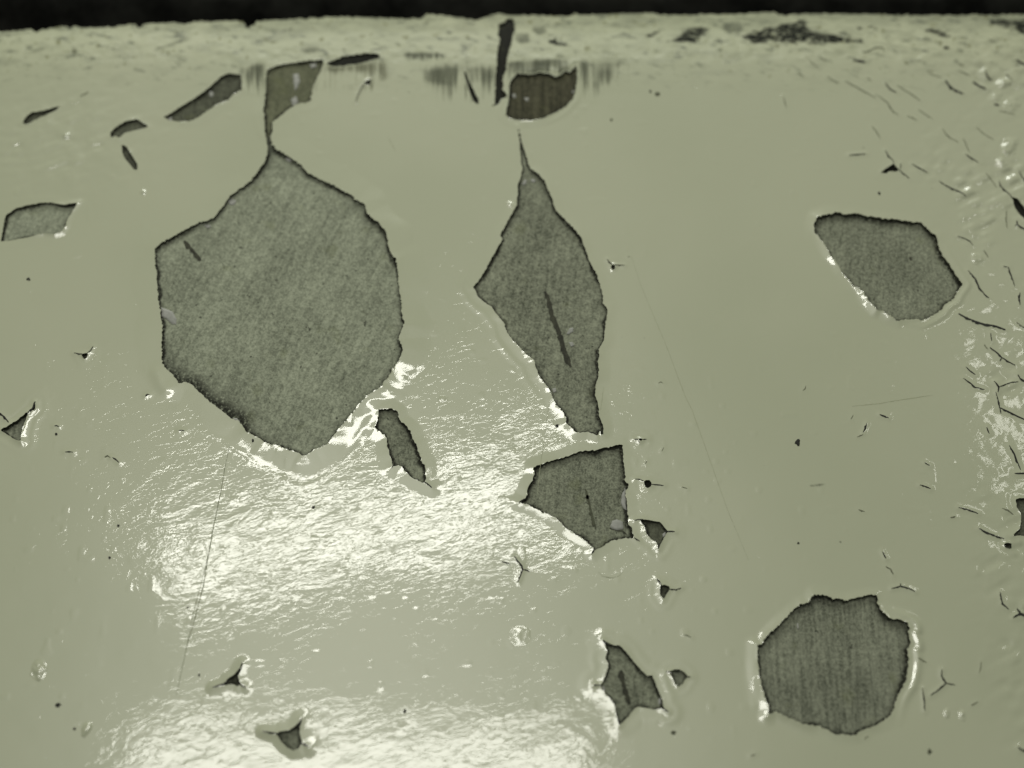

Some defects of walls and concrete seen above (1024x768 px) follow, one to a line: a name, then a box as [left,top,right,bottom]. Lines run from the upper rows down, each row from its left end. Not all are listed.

peeling [1,202,76,241]
peeling [155,53,404,456]
peeling [473,18,675,554]
peeling [814,212,962,321]
peeling [1,402,35,441]
peeling [375,408,432,488]
peeling [212,663,246,688]
peeling [594,640,669,725]
peeling [757,594,911,736]
peeling [262,718,309,751]